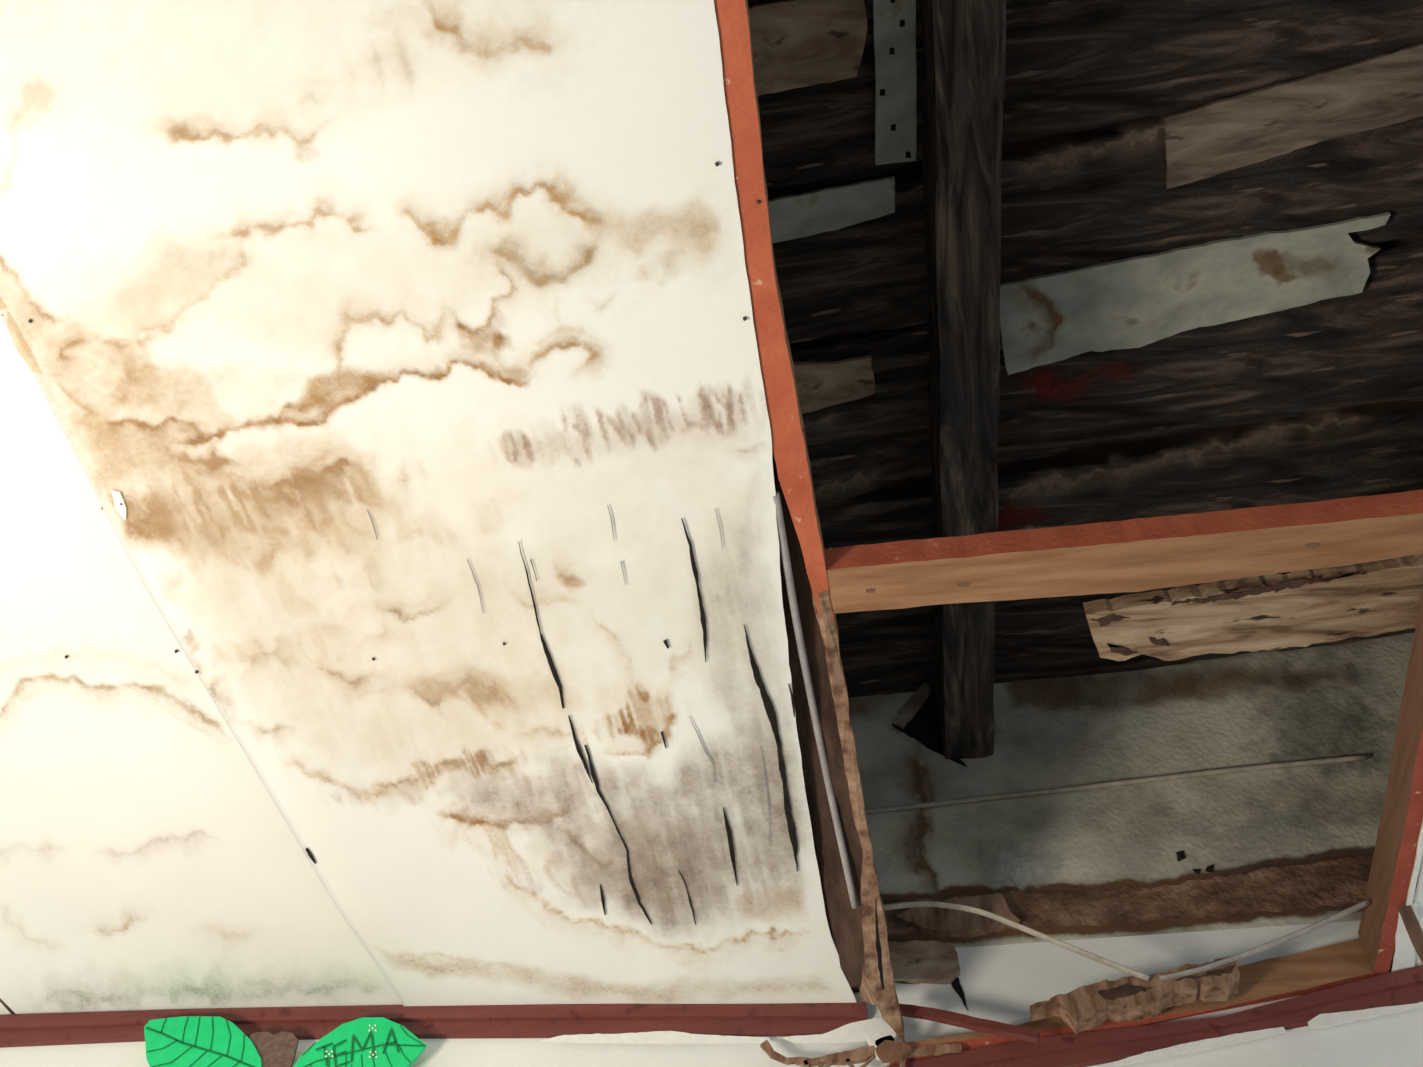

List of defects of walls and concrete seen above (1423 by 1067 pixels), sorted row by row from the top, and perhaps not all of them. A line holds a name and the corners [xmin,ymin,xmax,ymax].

water stain [456,243,595,349]
water stain [107,313,525,541]
crack [518,541,652,925]
water stain [449,748,798,924]
water stain [607,689,675,755]
crack [661,716,738,886]
crack [681,508,723,662]
crack [744,625,798,871]
spalling [1107,637,1169,656]
spalling [1171,572,1367,606]
spalling [880,847,1375,984]
peeling [1391,903,1418,972]